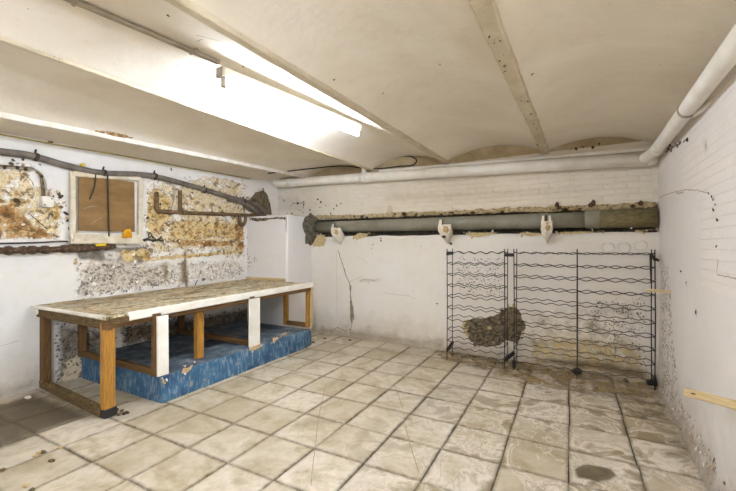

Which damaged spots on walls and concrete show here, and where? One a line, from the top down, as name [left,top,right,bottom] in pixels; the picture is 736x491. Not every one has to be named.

peeling [0,158,69,241]
peeling [73,177,656,269]
crack [323,251,413,336]
water stain [537,301,645,378]
water stain [576,465,615,482]